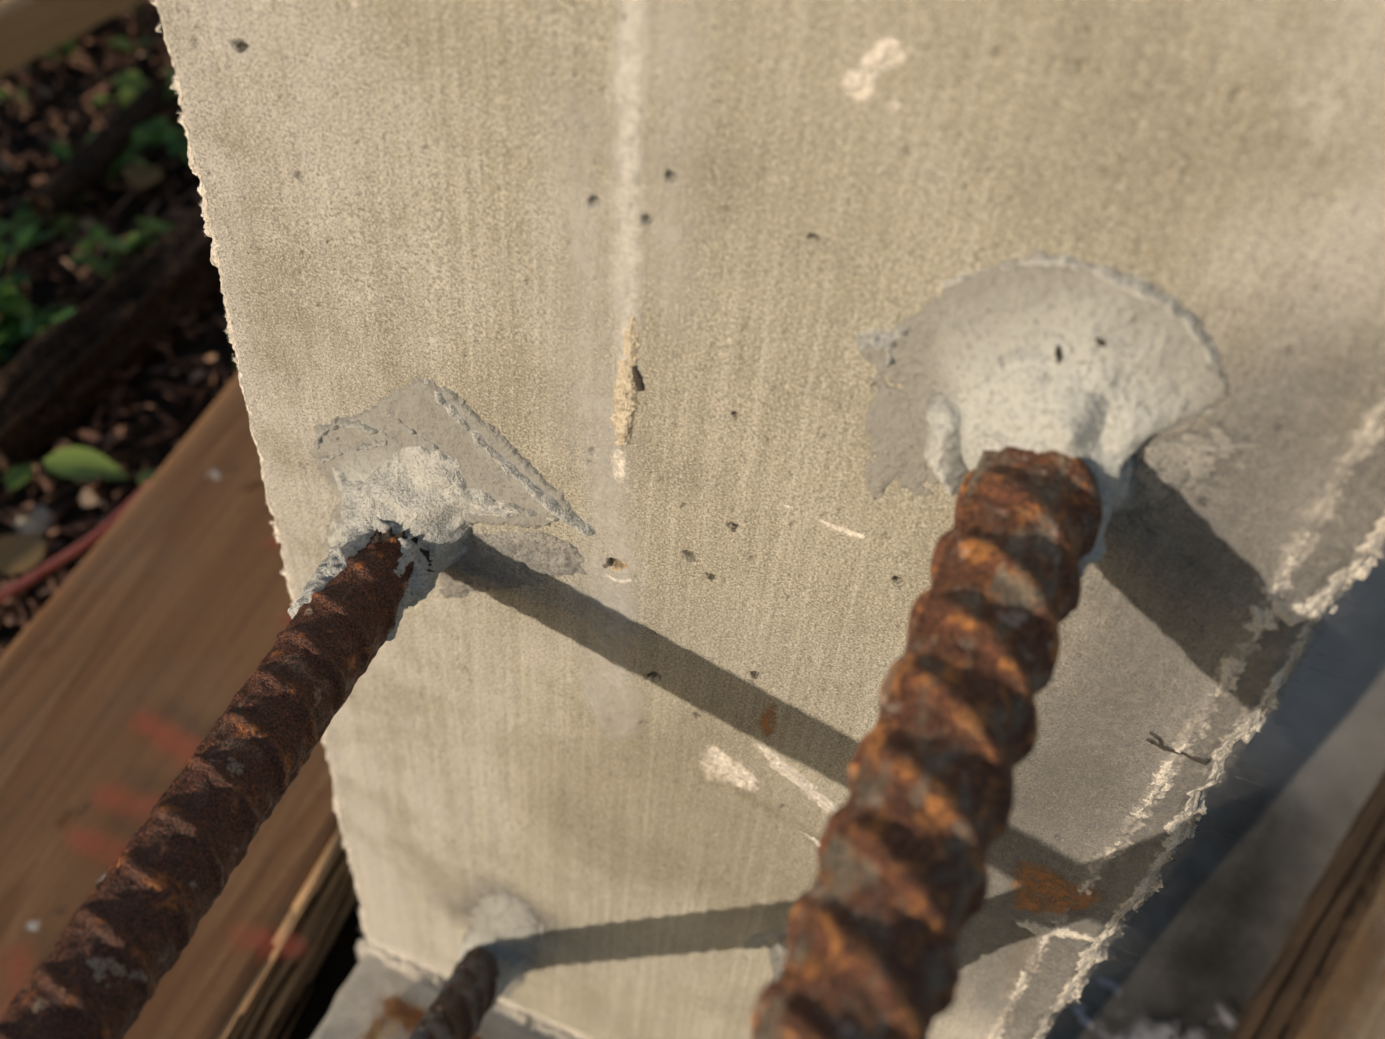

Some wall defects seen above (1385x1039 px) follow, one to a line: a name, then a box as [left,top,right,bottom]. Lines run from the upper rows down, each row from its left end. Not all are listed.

spalling [610,315,645,479]
spalling [0,0,578,1039]
spalling [602,557,631,583]
spalling [751,446,1103,1039]
crack [1146,731,1211,765]
spalling [987,481,1385,1039]
rust [365,996,426,1039]